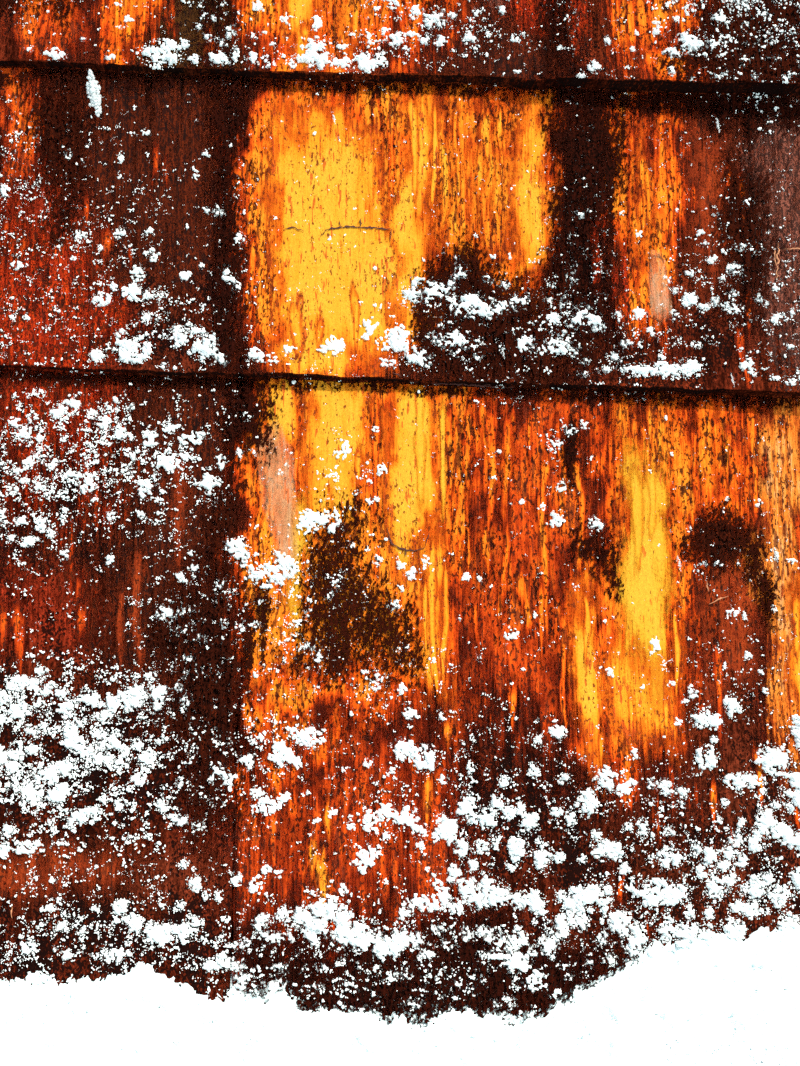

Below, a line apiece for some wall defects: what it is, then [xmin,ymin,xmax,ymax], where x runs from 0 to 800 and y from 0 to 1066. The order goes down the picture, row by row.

rust [0,0,179,65]
rust [198,27,225,68]
rust [220,0,485,74]
rust [501,0,800,81]
rust [0,67,572,383]
rust [590,92,788,389]
rust [0,340,800,994]